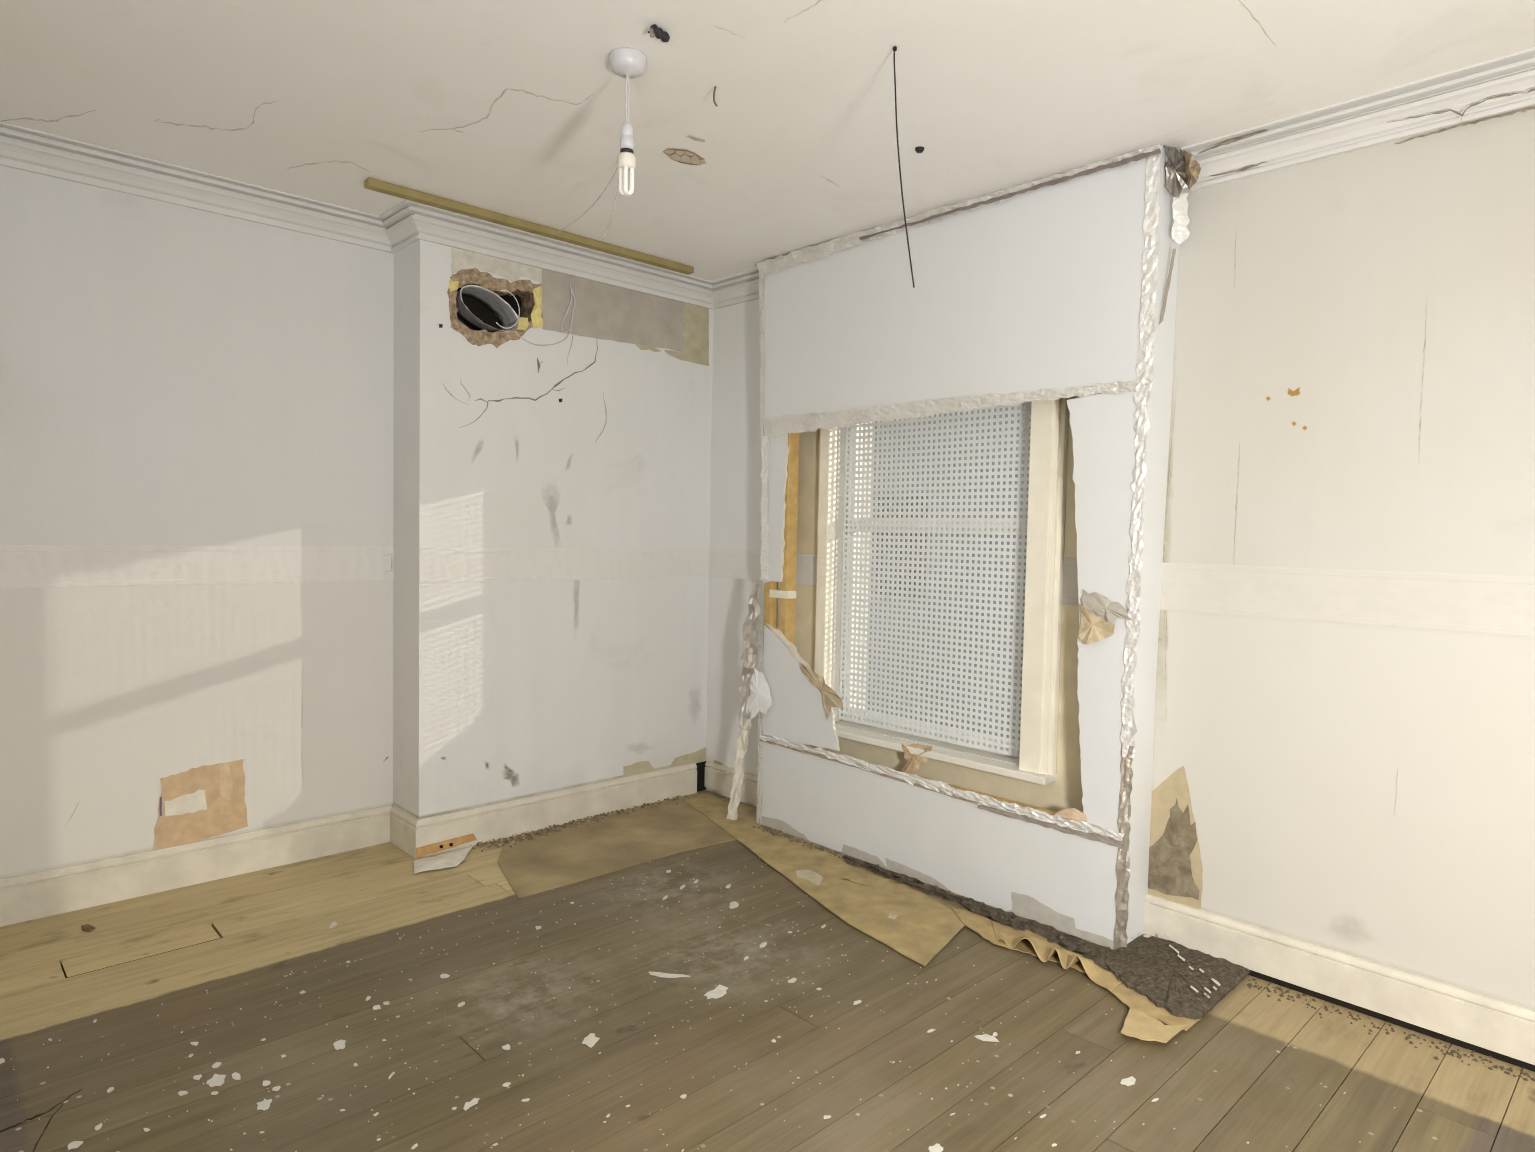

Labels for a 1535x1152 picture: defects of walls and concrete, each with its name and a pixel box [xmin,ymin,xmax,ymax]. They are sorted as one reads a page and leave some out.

crack [1238,0,1277,47]
crack [155,101,276,131]
crack [420,88,594,133]
crack [1387,88,1535,144]
spalling [1183,151,1201,189]
hole [447,268,543,348]
crack [443,334,607,443]